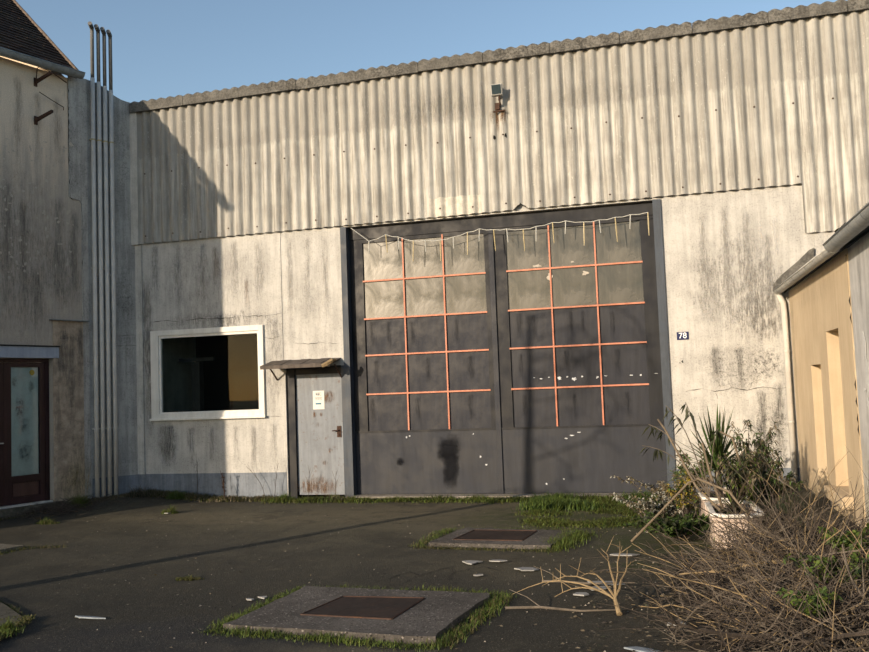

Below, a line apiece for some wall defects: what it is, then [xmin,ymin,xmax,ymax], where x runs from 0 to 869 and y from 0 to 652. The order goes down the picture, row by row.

damp [697,241,775,327]